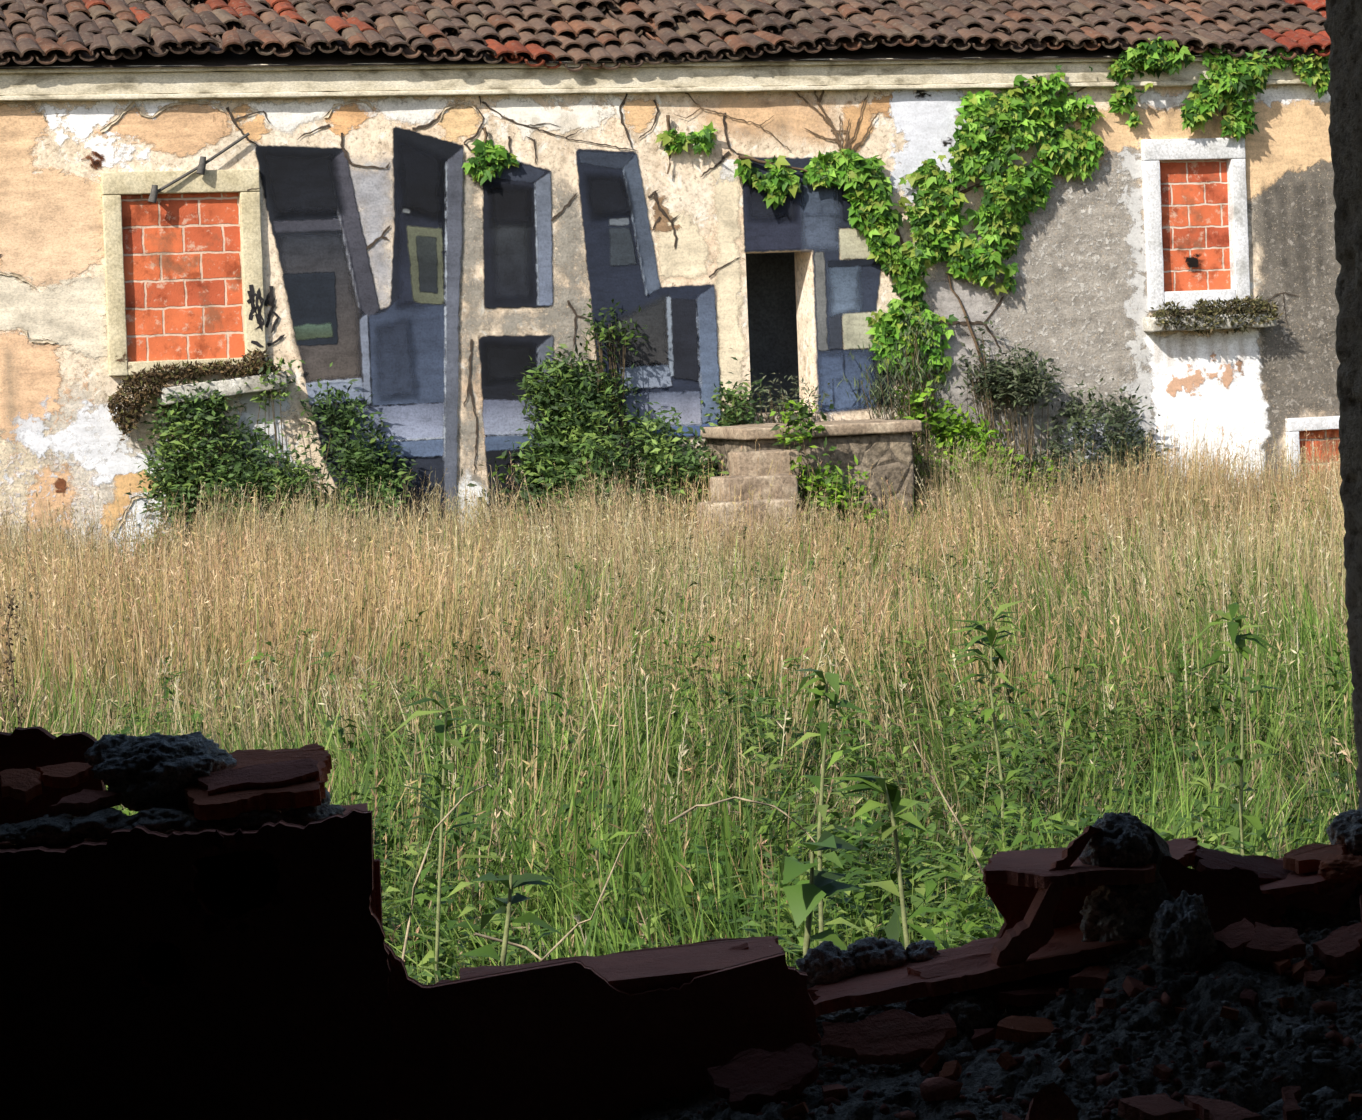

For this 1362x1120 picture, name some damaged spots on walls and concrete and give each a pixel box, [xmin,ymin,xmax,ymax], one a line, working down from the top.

crack [226,107,270,145]
crack [297,124,390,169]
crack [412,112,442,131]
crack [464,93,660,165]
crack [701,113,745,177]
crack [648,190,679,249]
peeling [928,85,1340,493]
flaking render [0,93,659,565]
water stain [1247,159,1341,492]